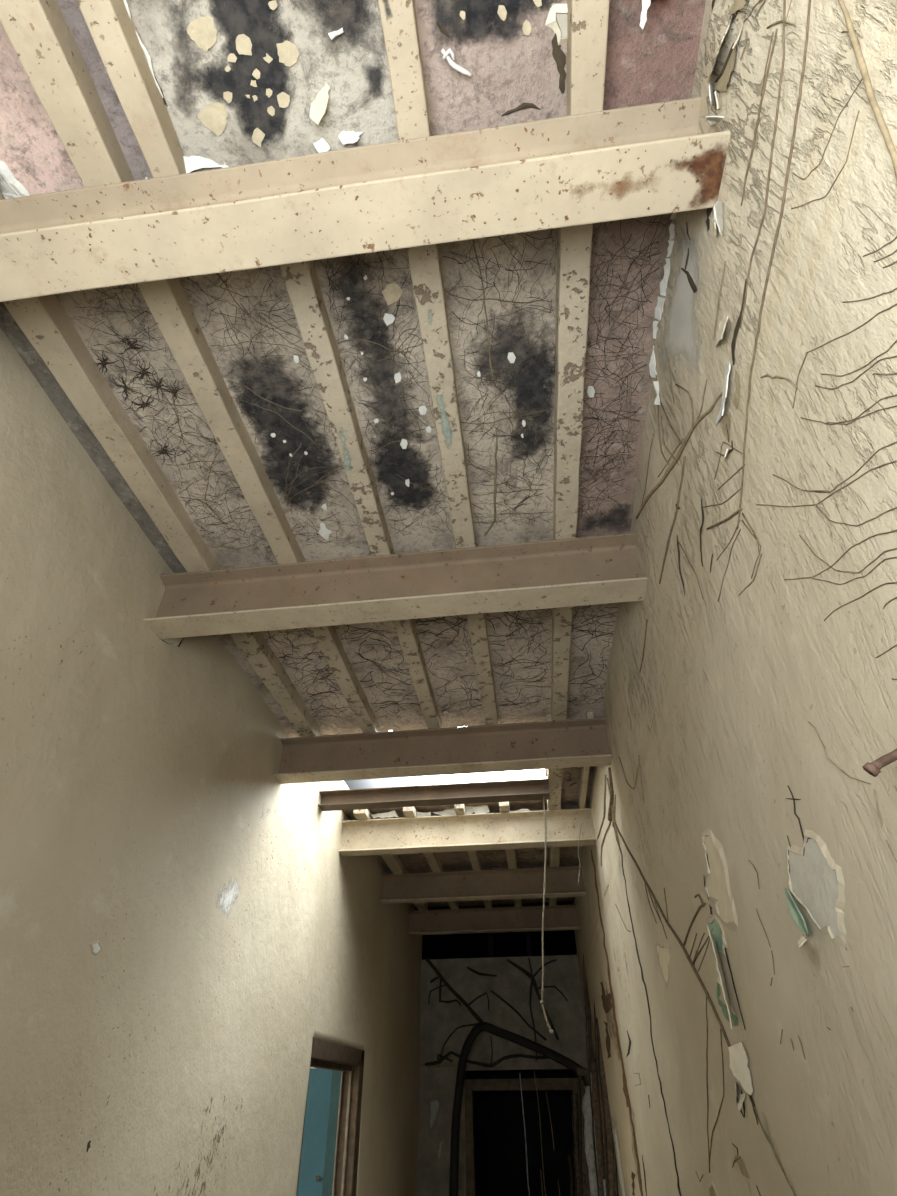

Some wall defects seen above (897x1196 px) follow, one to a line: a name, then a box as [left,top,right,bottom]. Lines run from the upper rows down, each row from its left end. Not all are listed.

water stain [174,0,300,147]
water stain [299,0,370,52]
water stain [433,0,547,77]
peeling [639,0,651,30]
corrosion [611,178,631,196]
corrosion [675,146,727,207]
water stain [332,260,435,510]
crack [484,431,551,537]
crack [675,499,713,595]
spalling [785,786,846,948]
crack [591,827,682,1196]
peeling [702,829,758,1125]